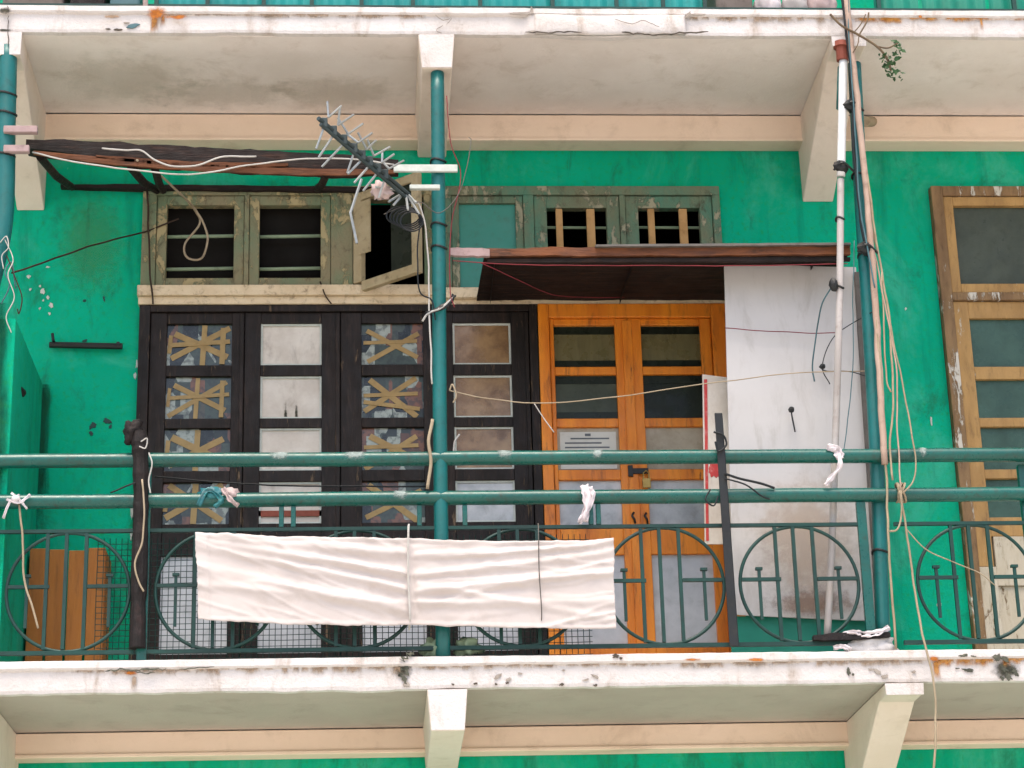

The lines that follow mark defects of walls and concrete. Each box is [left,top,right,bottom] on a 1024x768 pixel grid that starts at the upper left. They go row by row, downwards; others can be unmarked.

corrosion [149,7,185,30]
crack [529,28,582,36]
crack [616,19,708,36]